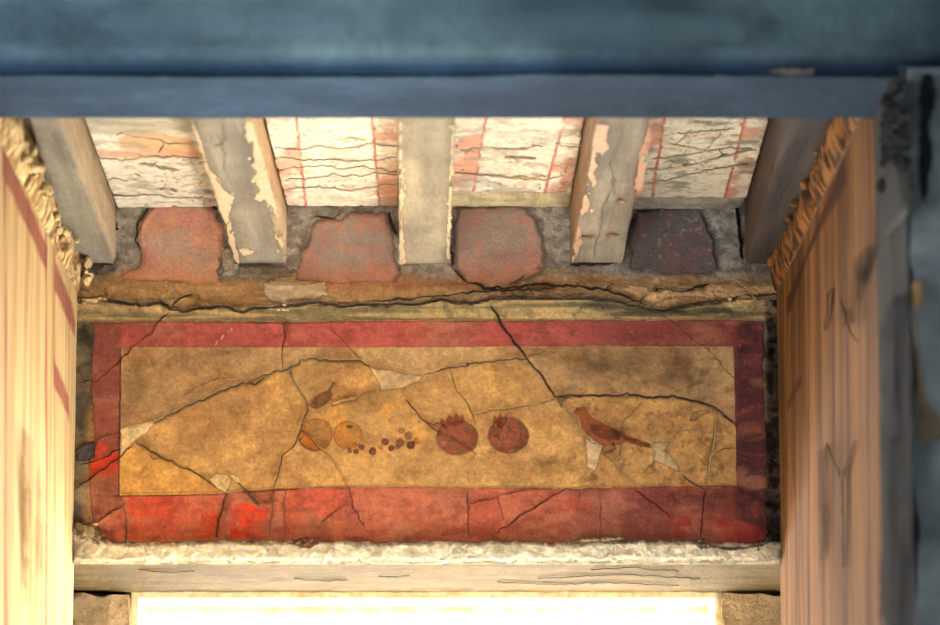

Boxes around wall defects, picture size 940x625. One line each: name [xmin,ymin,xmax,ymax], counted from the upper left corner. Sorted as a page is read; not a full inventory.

crack [98,123,229,249]
peeling [191,121,327,311]
crack [274,135,397,219]
crack [455,142,581,181]
peeling [571,125,609,264]
peeling [634,127,651,192]
crack [646,129,757,184]
crack [76,152,777,543]